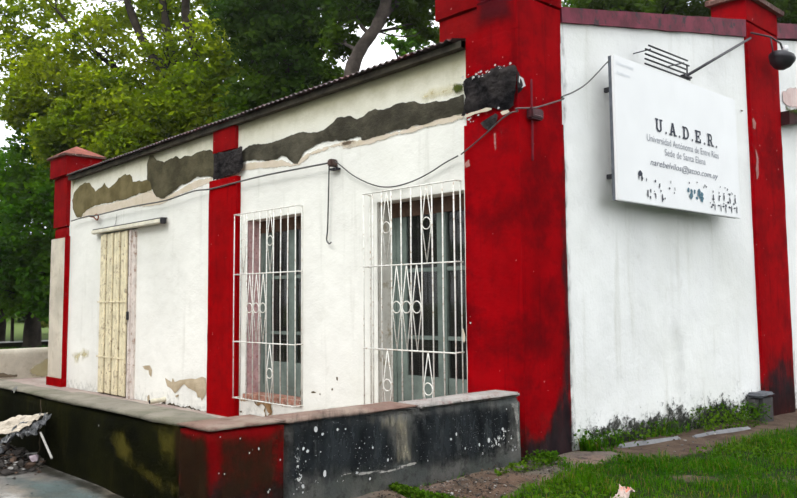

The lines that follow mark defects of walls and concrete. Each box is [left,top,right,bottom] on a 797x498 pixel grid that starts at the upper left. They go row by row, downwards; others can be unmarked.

peeling [782,88,797,107]
flaking render [72,62,526,218]
flaking render [165,377,206,400]
water stain [287,403,514,495]
water stain [528,410,572,456]